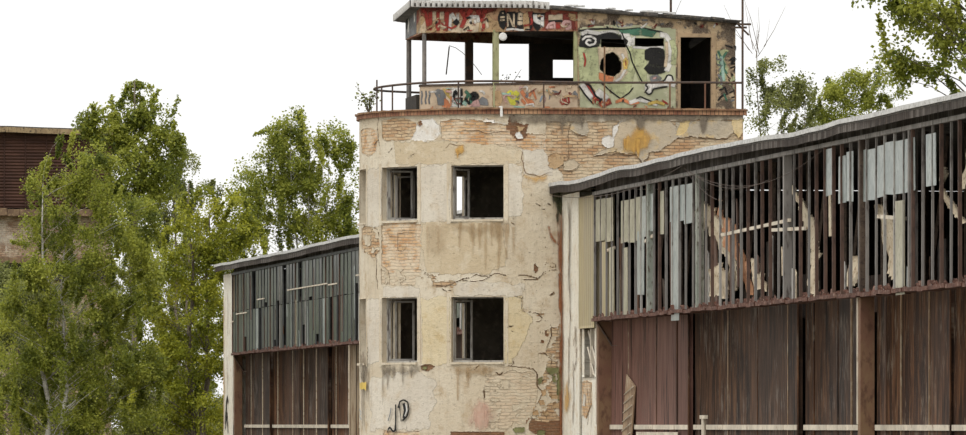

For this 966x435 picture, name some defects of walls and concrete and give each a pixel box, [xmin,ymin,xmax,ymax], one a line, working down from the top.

spalling [361,118,423,156]
spalling [440,115,743,181]
spalling [362,222,457,289]
crack [436,247,590,425]
spalling [451,324,561,435]